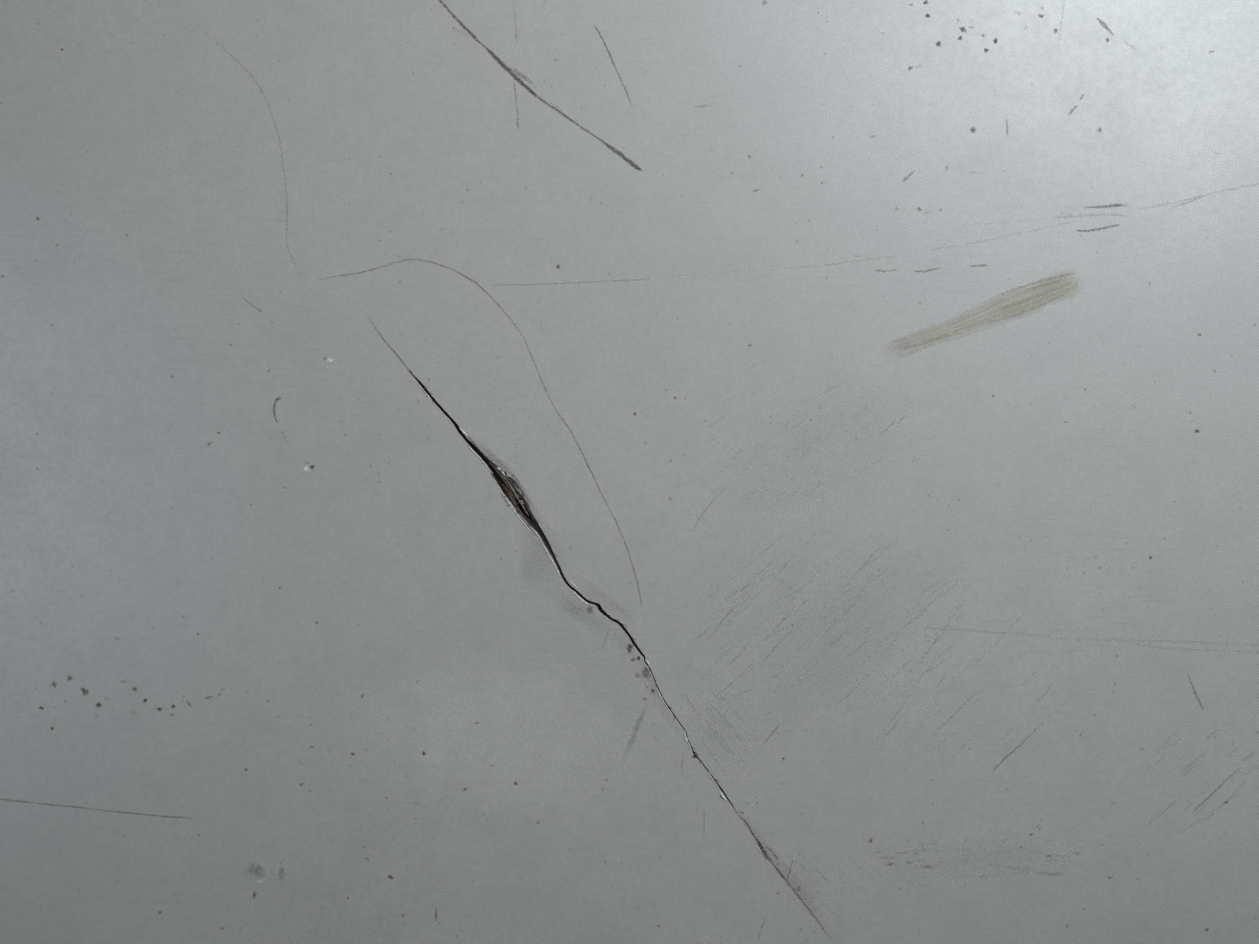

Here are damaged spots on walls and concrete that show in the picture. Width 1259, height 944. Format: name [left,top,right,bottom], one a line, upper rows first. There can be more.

crack [409,370,785,879]